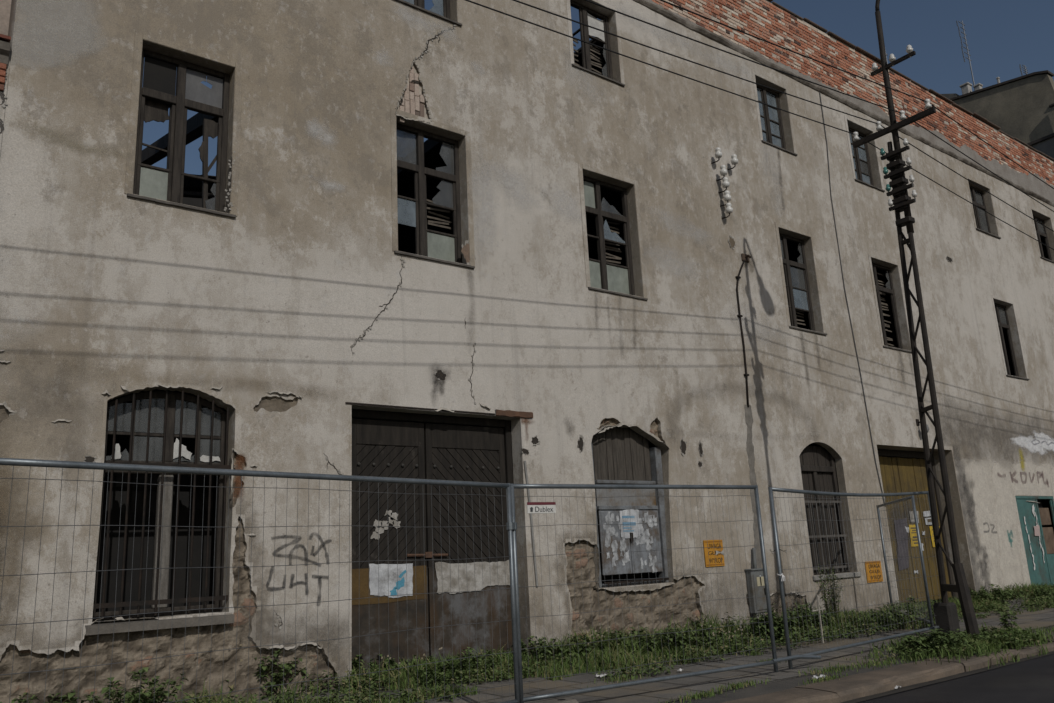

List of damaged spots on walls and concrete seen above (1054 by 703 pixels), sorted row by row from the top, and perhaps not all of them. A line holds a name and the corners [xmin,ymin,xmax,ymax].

flaking render [0,518,345,703]